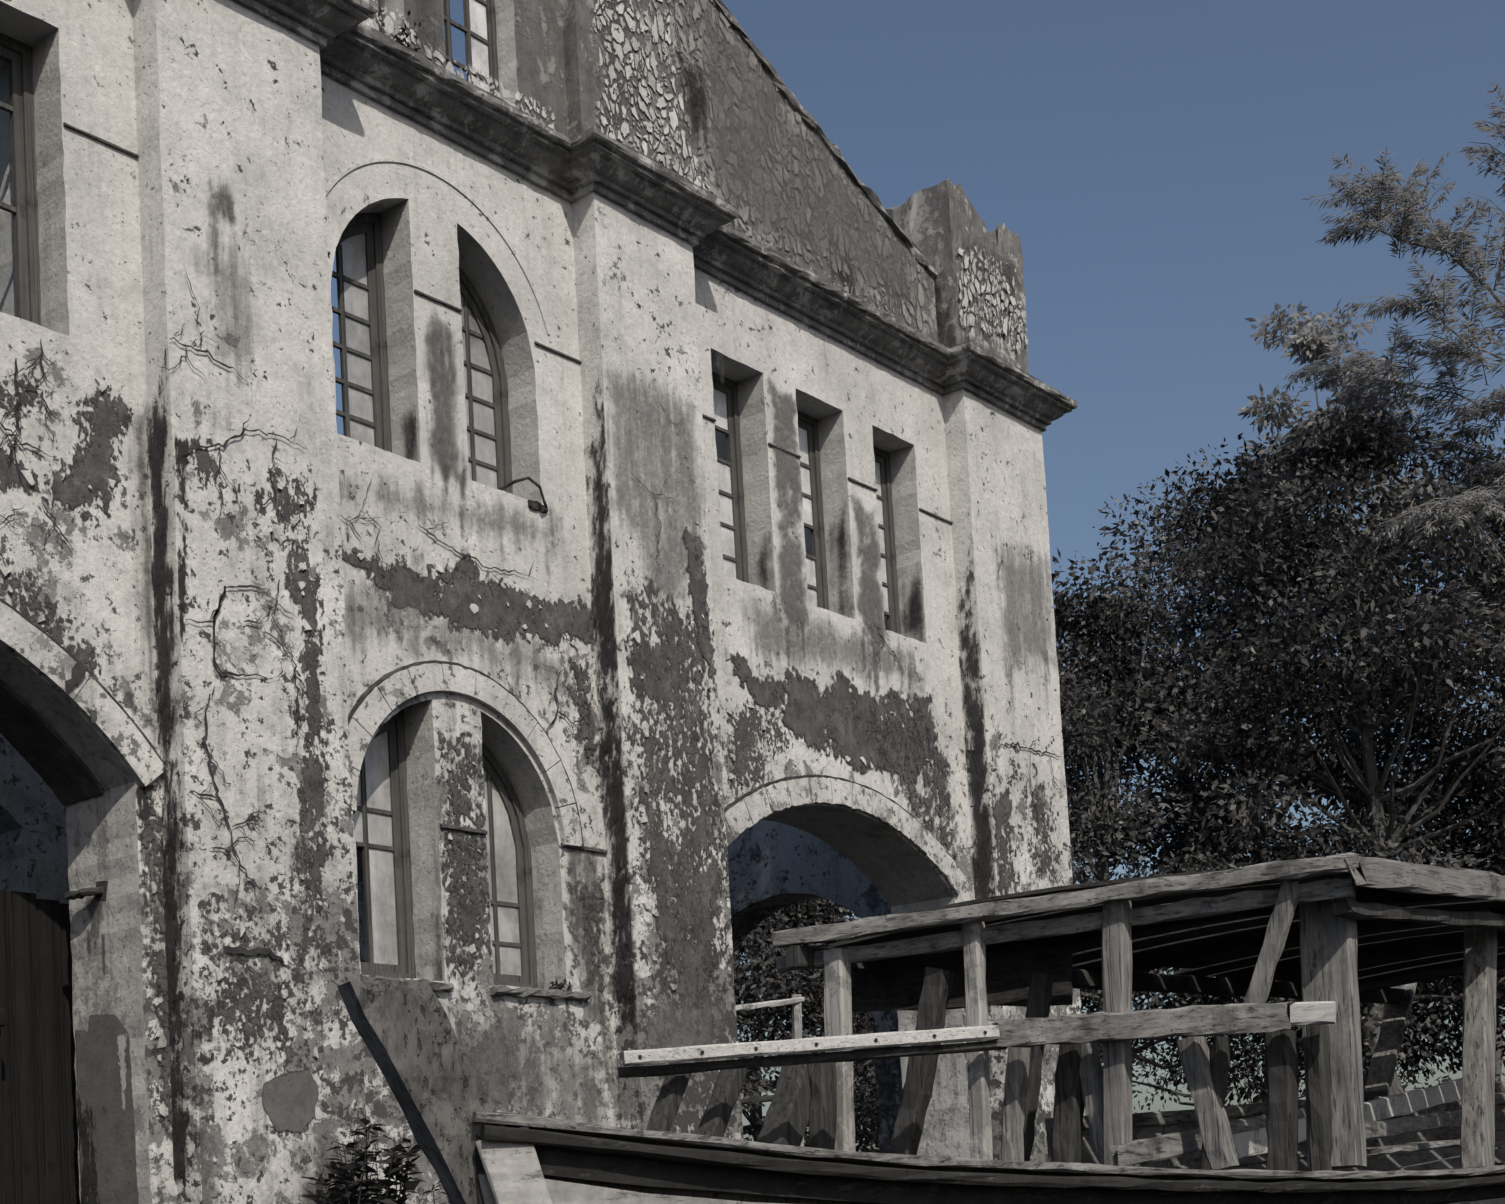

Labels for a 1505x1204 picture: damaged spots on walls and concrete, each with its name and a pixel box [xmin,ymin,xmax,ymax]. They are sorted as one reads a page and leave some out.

leakage [213,185,249,357]
crack [0,339,72,567]
flaking render [0,371,134,529]
crack [159,268,307,519]
leakage [404,319,558,544]
leakage [613,375,701,595]
flaking render [168,431,339,1133]
crack [185,579,324,963]
flaking render [342,532,602,776]
flaking render [621,521,957,1010]
flaking render [137,780,173,1132]
leakage [647,1001,720,1063]